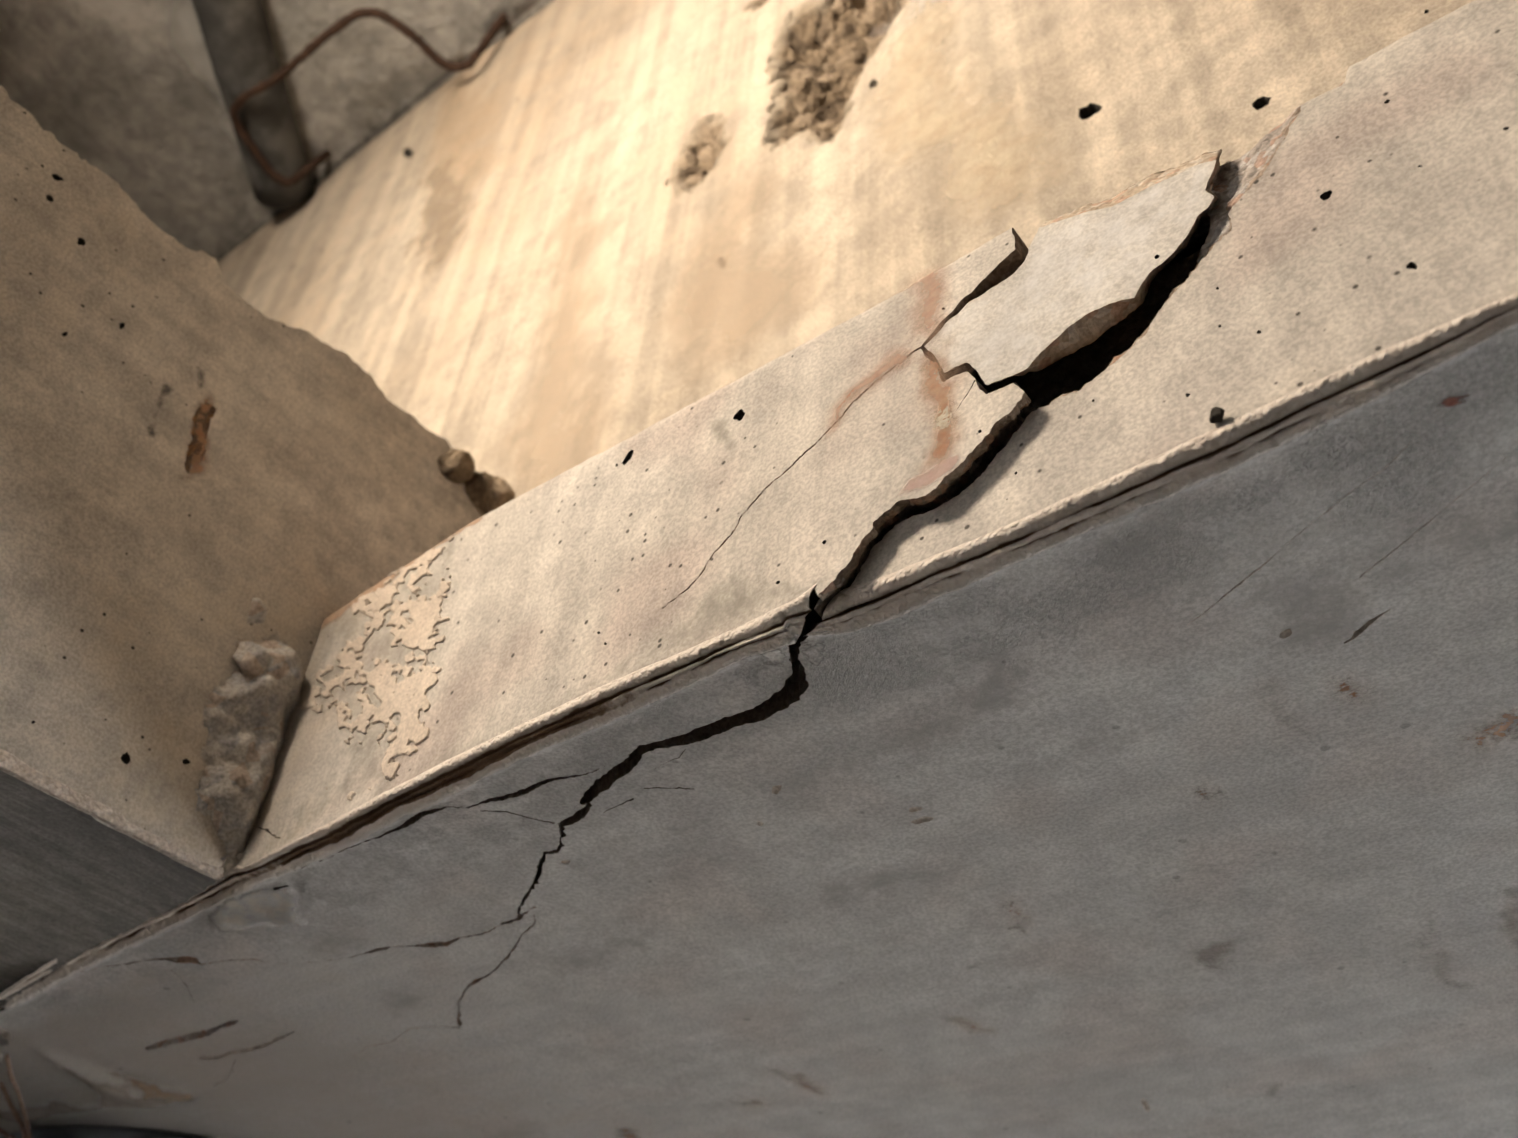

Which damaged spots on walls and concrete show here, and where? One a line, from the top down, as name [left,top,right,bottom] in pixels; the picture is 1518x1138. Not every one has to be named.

leakage [879,0,1039,206]
rust [924,360,952,459]
crack [80,105,1302,1053]